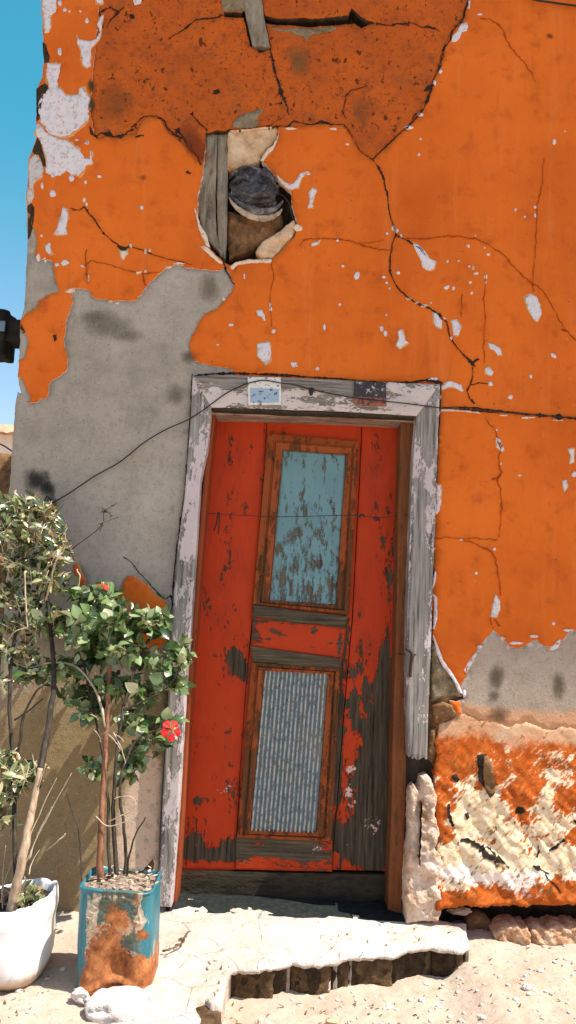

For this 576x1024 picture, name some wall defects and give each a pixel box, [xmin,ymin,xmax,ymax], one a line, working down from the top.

crack [71,206,190,286]
peeling [385,225,487,294]
crack [89,0,576,692]
peeling [523,293,542,322]
water stain [28,472,56,512]
peeling [0,0,469,912]
peeling [427,571,576,770]